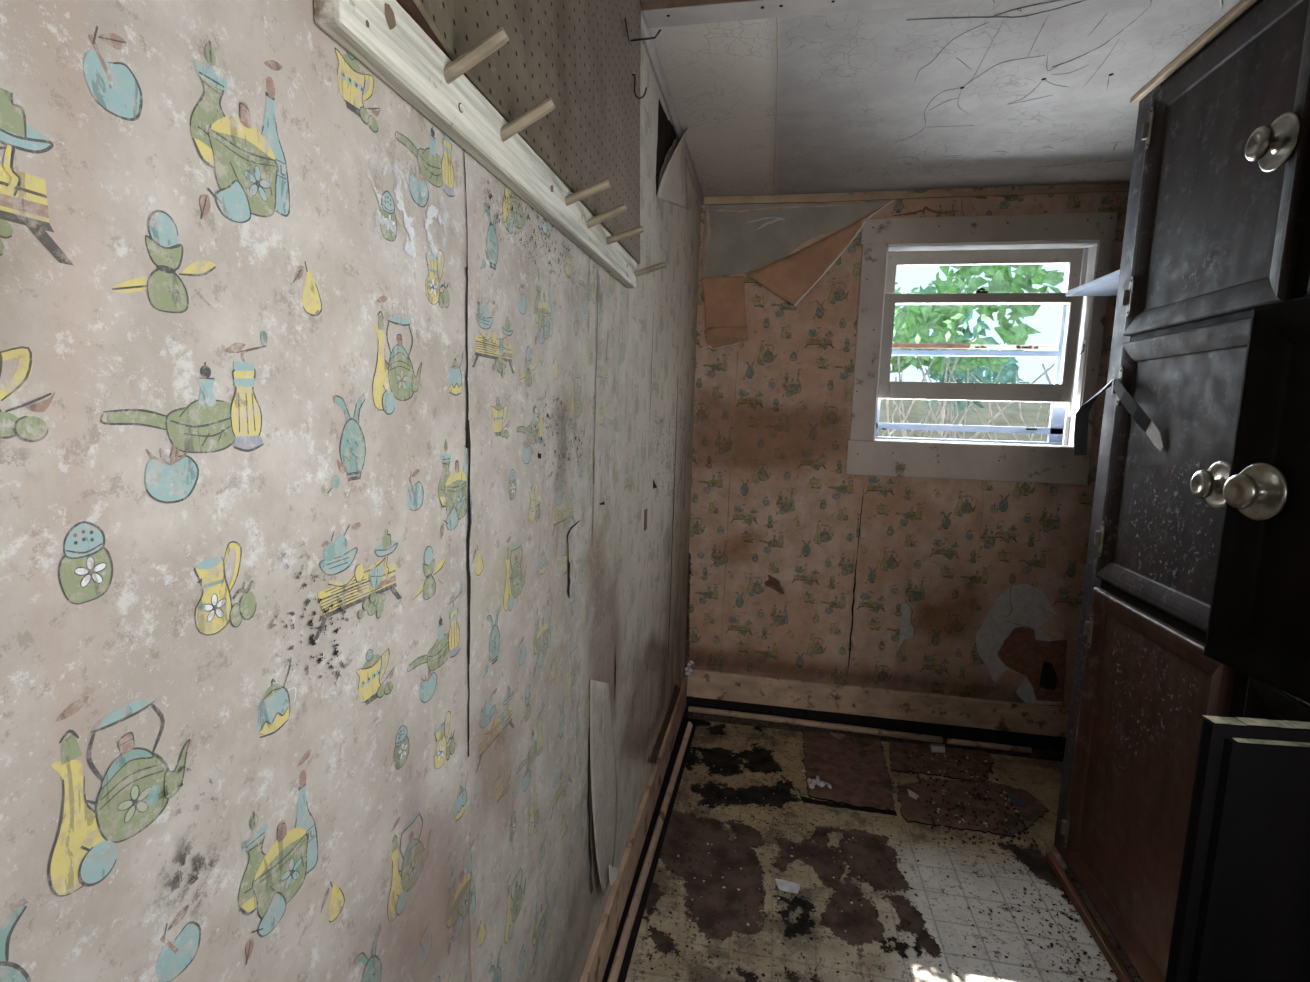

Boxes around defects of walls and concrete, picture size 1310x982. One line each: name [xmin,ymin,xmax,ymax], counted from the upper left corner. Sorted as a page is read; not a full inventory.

crack [897,0,1152,142]
peeling [701,200,894,349]
damp [273,567,353,682]
flaking render [976,583,1068,705]
peeling [588,679,619,895]
peeling [696,720,782,777]
peeling [642,914,681,964]
peeling [736,965,760,982]
peeling [773,826,934,959]